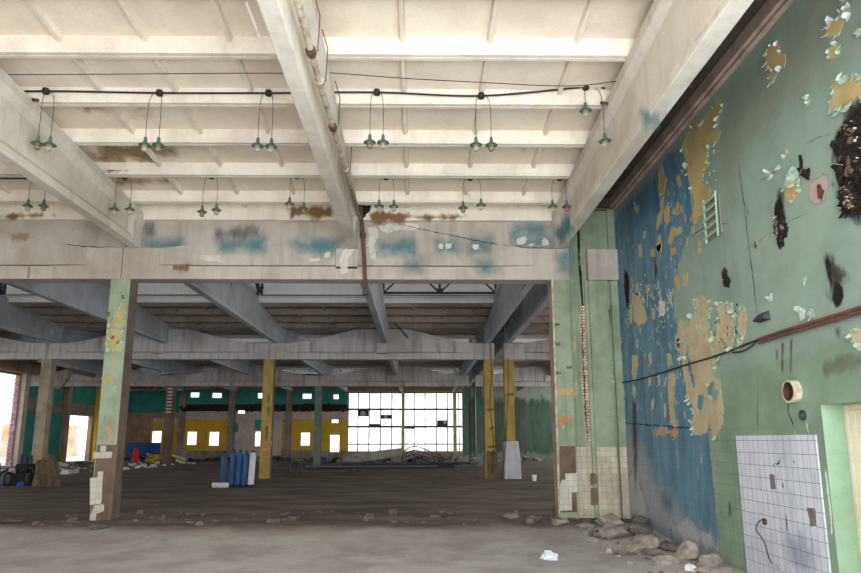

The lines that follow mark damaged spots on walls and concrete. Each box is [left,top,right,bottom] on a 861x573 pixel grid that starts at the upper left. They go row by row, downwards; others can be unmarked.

peeling [820,0,861,59]
peeling [761,39,786,87]
peeling [827,71,861,117]
flaking render [763,131,861,219]
crack [401,224,552,249]
peeling [608,97,747,441]
peeling [105,295,126,364]
peeling [845,326,861,352]
flaking render [90,419,118,520]
flaking render [559,446,576,484]
flaking render [560,492,577,513]